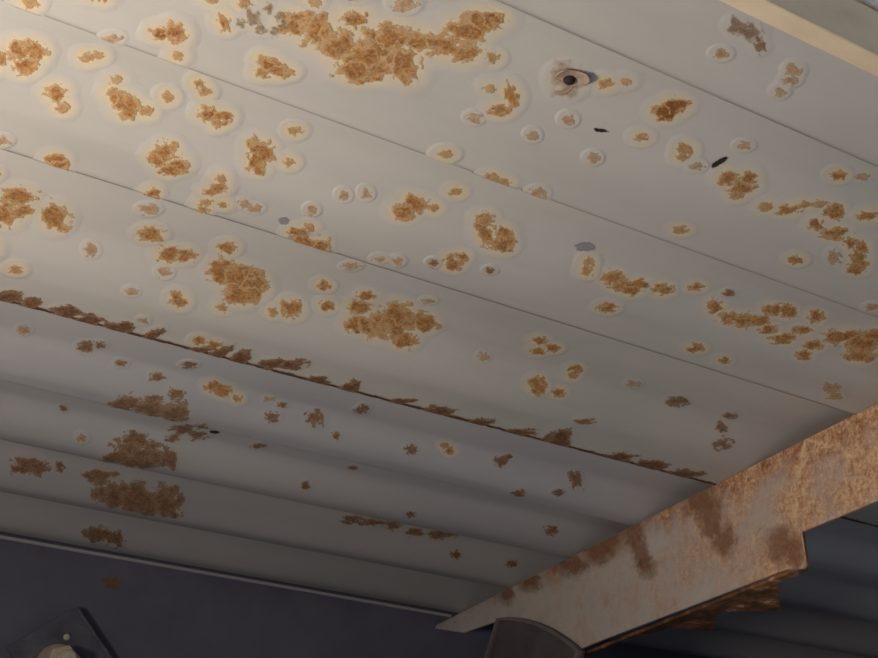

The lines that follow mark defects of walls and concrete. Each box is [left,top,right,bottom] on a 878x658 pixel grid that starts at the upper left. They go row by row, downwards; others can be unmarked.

rust [0,0,878,372]
rust [0,257,720,550]
rust [706,409,744,454]